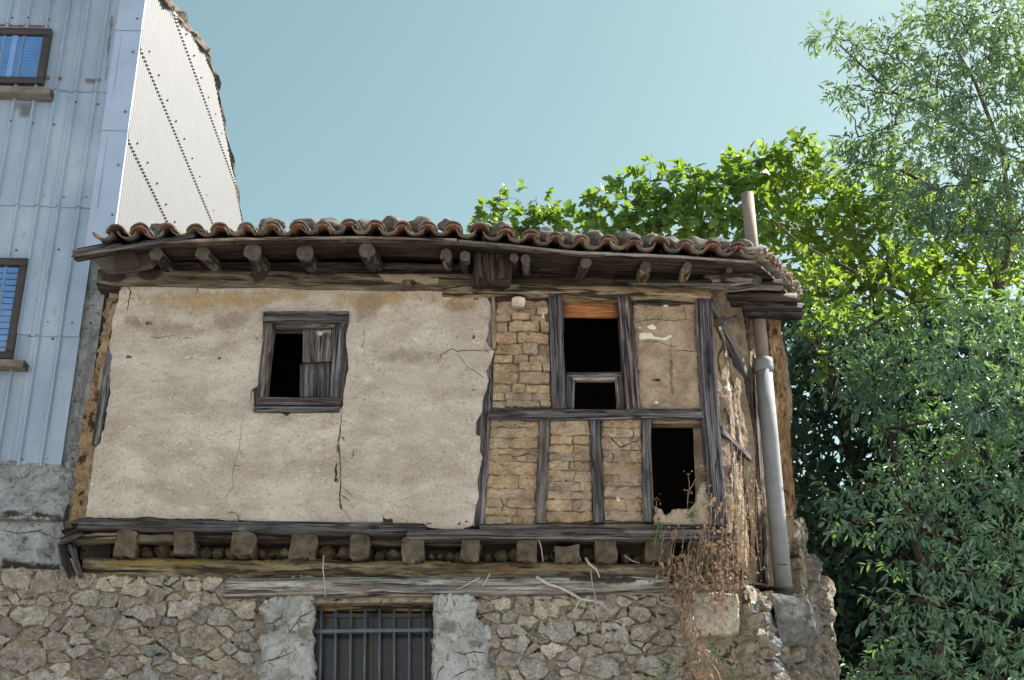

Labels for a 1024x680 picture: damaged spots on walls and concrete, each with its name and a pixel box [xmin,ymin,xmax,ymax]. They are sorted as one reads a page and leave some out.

crack [435,348,490,377]
crack [226,388,254,520]
crack [335,408,354,521]